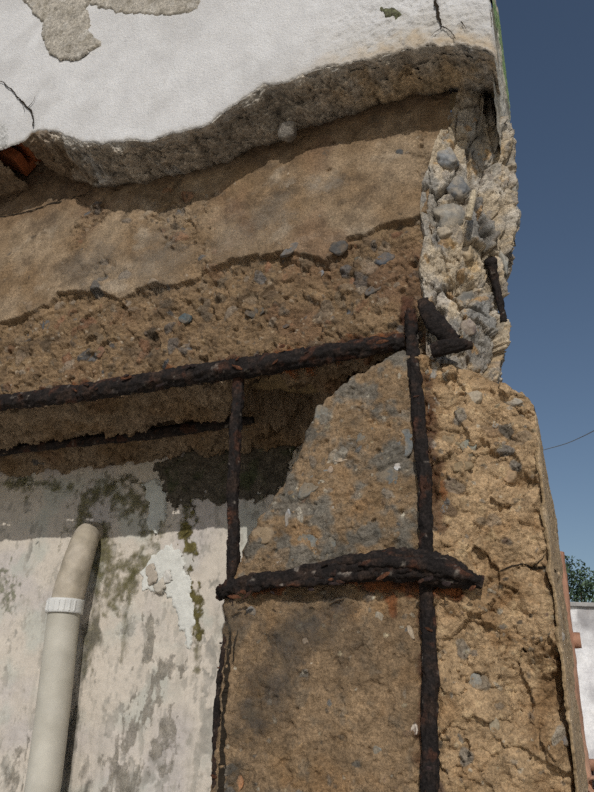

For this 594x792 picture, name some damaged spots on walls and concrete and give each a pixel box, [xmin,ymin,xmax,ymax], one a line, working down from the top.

crack [0,81,35,127]
peeling [23,0,200,62]
crack [431,0,466,39]
spalling [0,91,451,395]
spalling [0,380,233,534]
spalling [234,339,420,579]
spalling [415,86,576,792]
leakage [64,710,78,777]
leakage [81,616,101,677]
leakage [98,613,187,792]
spalling [210,584,422,792]
rust [228,547,481,617]